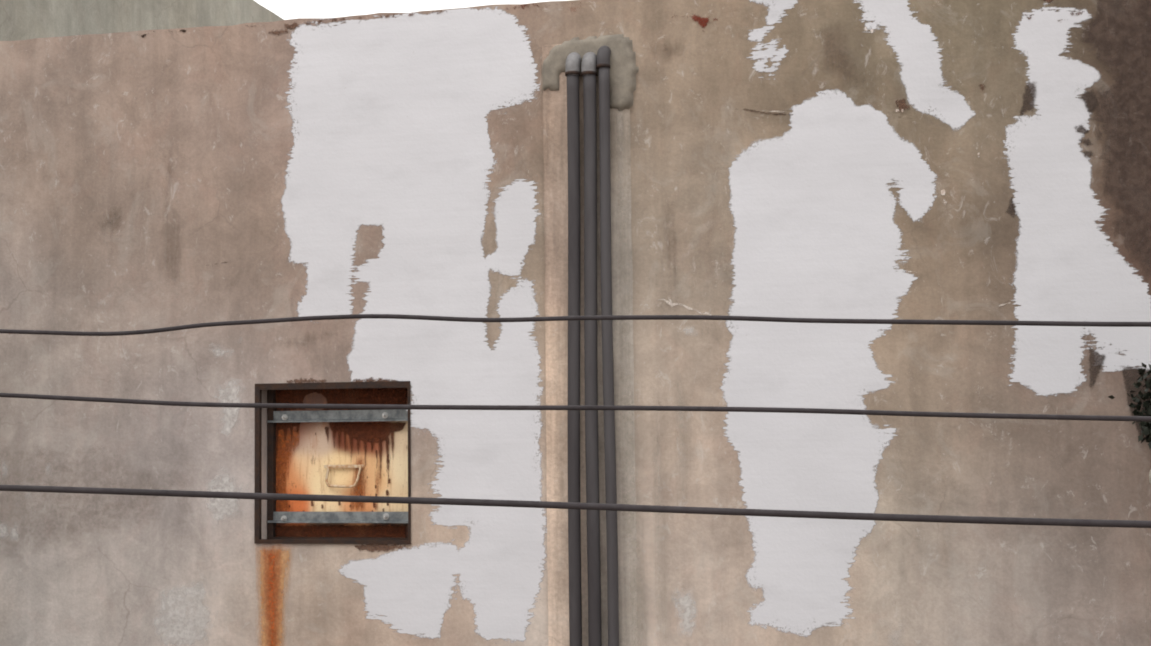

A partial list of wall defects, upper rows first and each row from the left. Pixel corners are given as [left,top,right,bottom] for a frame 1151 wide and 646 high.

spalling [268,18,344,35]
spalling [895,98,910,112]
rust [260,388,407,646]
spalling [355,544,408,552]